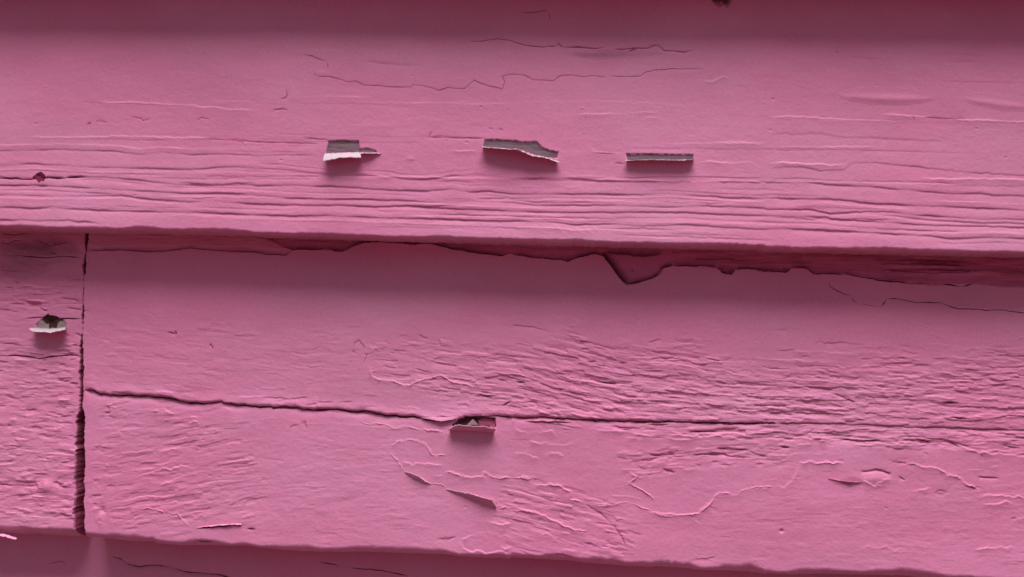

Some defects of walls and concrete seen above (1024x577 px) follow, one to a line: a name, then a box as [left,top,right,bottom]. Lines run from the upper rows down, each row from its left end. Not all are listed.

crack [304,38,693,91]
peeling [323,139,381,162]
peeling [481,138,560,163]
peeling [625,153,694,161]
peeling [89,237,378,256]
peeling [392,242,1024,287]
peeling [29,314,67,333]
crack [84,379,819,458]
peeling [422,416,496,432]
crack [835,394,1018,448]
crack [634,452,674,473]